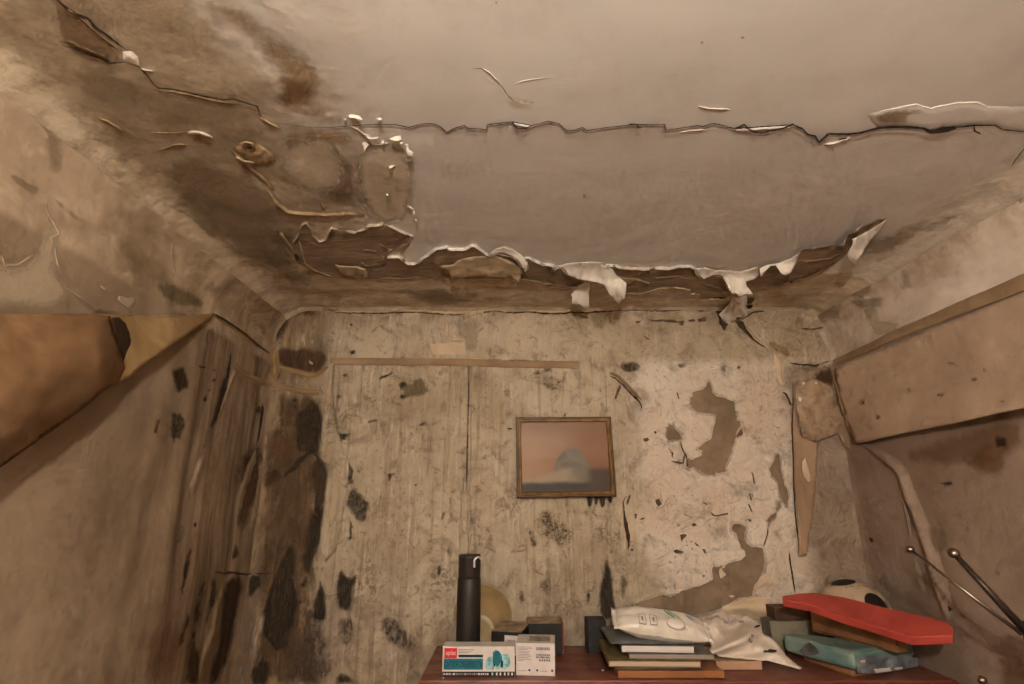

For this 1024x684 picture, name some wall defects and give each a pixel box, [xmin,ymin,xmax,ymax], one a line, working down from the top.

peeling [343,114,413,161]
leakage [361,151,410,220]
crack [56,0,1024,166]
peeling [869,101,1024,131]
leakage [0,209,62,302]
peeling [291,217,887,331]
peeling [0,313,214,467]
mould [154,414,184,438]
mould [173,368,188,392]
peeling [664,378,749,477]
leakage [178,398,355,684]
peeling [631,402,818,618]